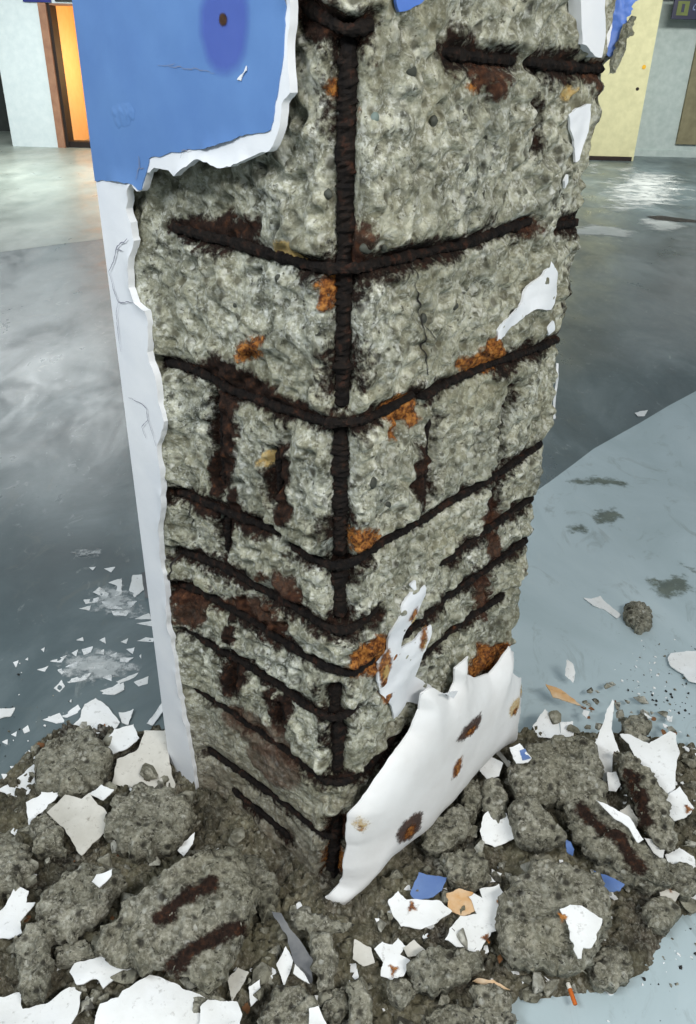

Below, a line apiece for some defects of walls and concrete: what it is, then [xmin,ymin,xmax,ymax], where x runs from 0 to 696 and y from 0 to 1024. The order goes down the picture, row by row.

corrosion [298,0,383,140]
corrosion [434,20,605,156]
corrosion [167,207,338,320]
corrosion [351,206,578,308]
spalling [133,0,638,905]
corrosion [160,263,572,876]